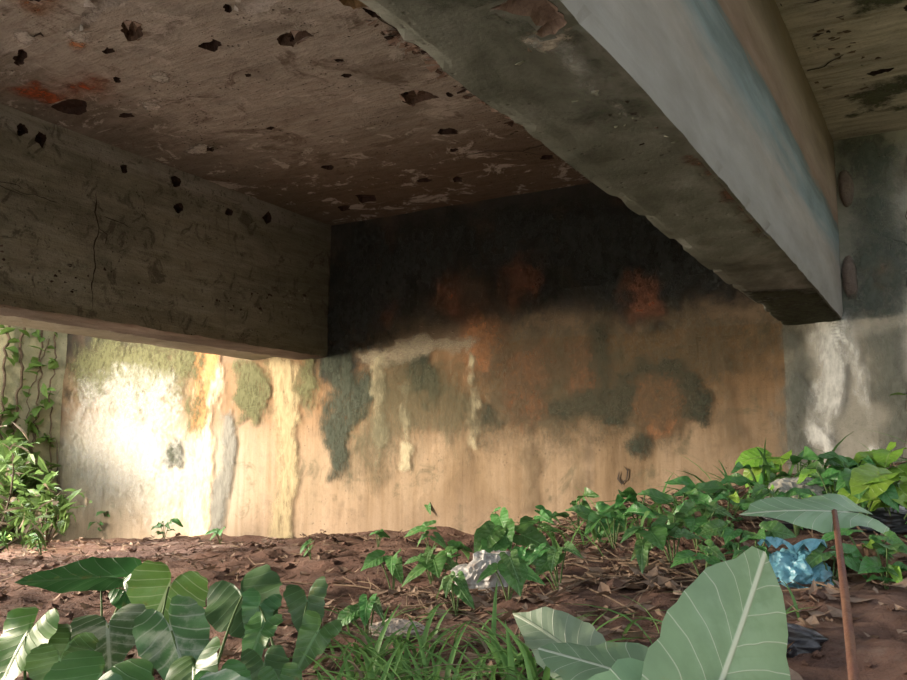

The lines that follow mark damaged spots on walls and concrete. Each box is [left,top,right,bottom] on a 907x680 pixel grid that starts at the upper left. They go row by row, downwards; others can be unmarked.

spalling [223,0,281,15]
water stain [854,0,903,14]
spalling [277,30,314,47]
peeling [326,0,449,79]
spalling [399,86,523,127]
water stain [845,75,907,118]
spalling [17,123,47,148]
crack [91,199,132,309]
water stain [68,134,907,539]
rust [191,352,218,429]